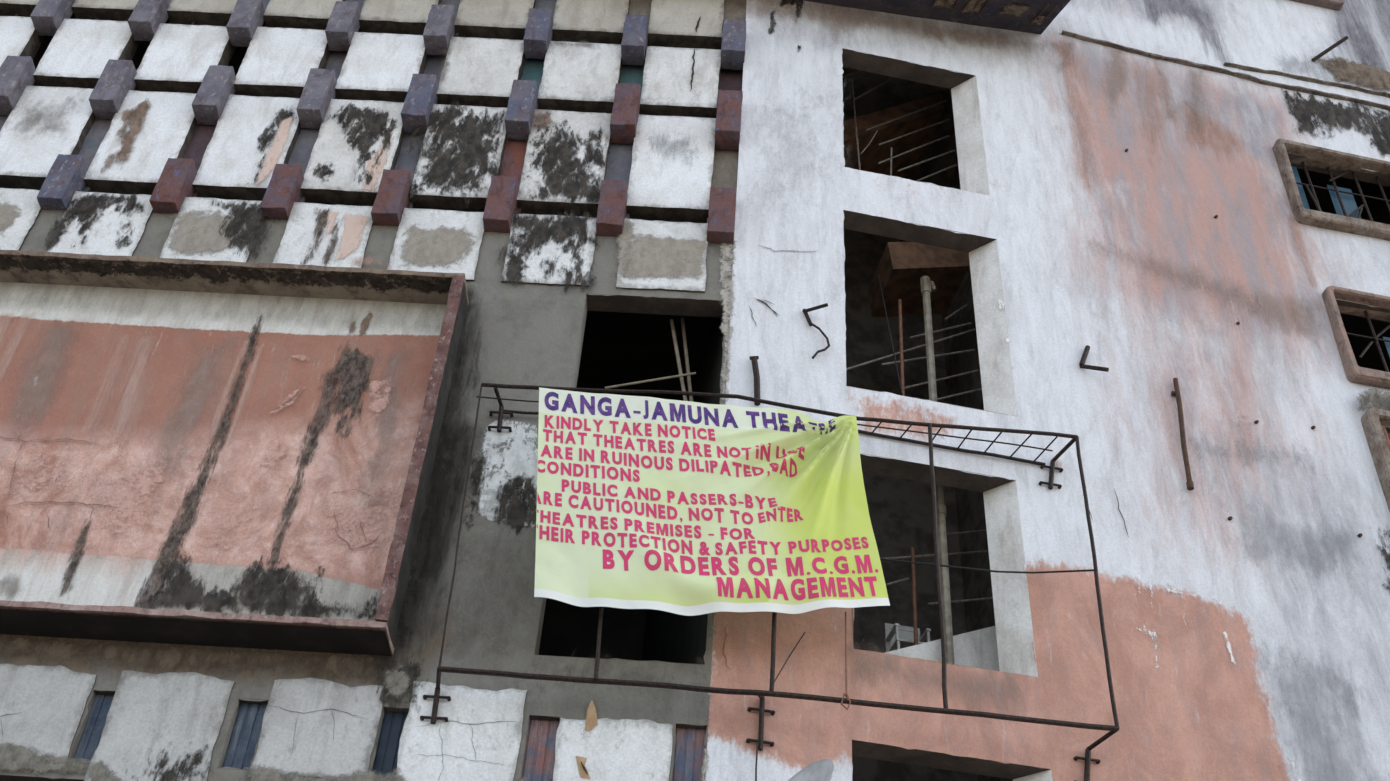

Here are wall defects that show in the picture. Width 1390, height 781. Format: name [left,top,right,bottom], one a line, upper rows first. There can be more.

spalling [1318,56,1390,90]
peeling [257,117,293,183]
damp [0,99,452,294]
damp [328,102,610,293]
peeling [401,224,475,268]
damp [0,290,537,713]
peeling [479,420,538,528]
damp [1377,526,1390,591]
damp [132,747,210,781]